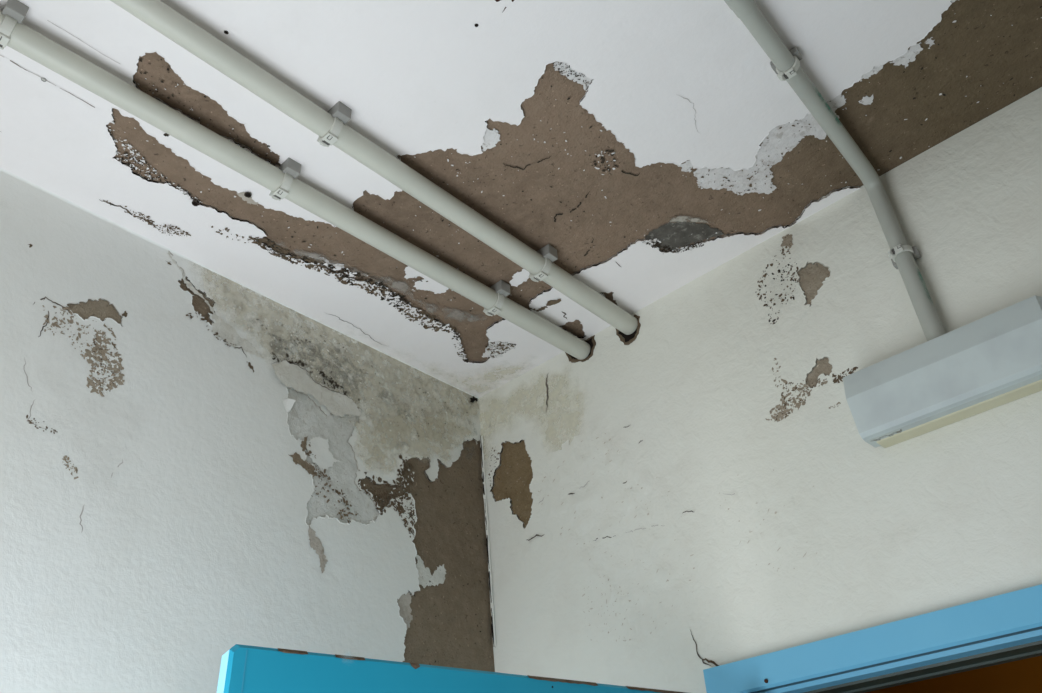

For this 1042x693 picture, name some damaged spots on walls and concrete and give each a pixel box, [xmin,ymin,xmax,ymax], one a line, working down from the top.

peeling [34,297,128,397]
peeling [132,51,281,167]
peeling [105,107,516,372]
damp [222,281,515,456]
peeling [351,189,596,363]
spalling [600,291,641,345]
peeling [396,60,863,324]
peeling [765,356,858,422]
peeling [826,0,1042,176]
peeling [282,387,534,672]
crack [690,630,720,666]